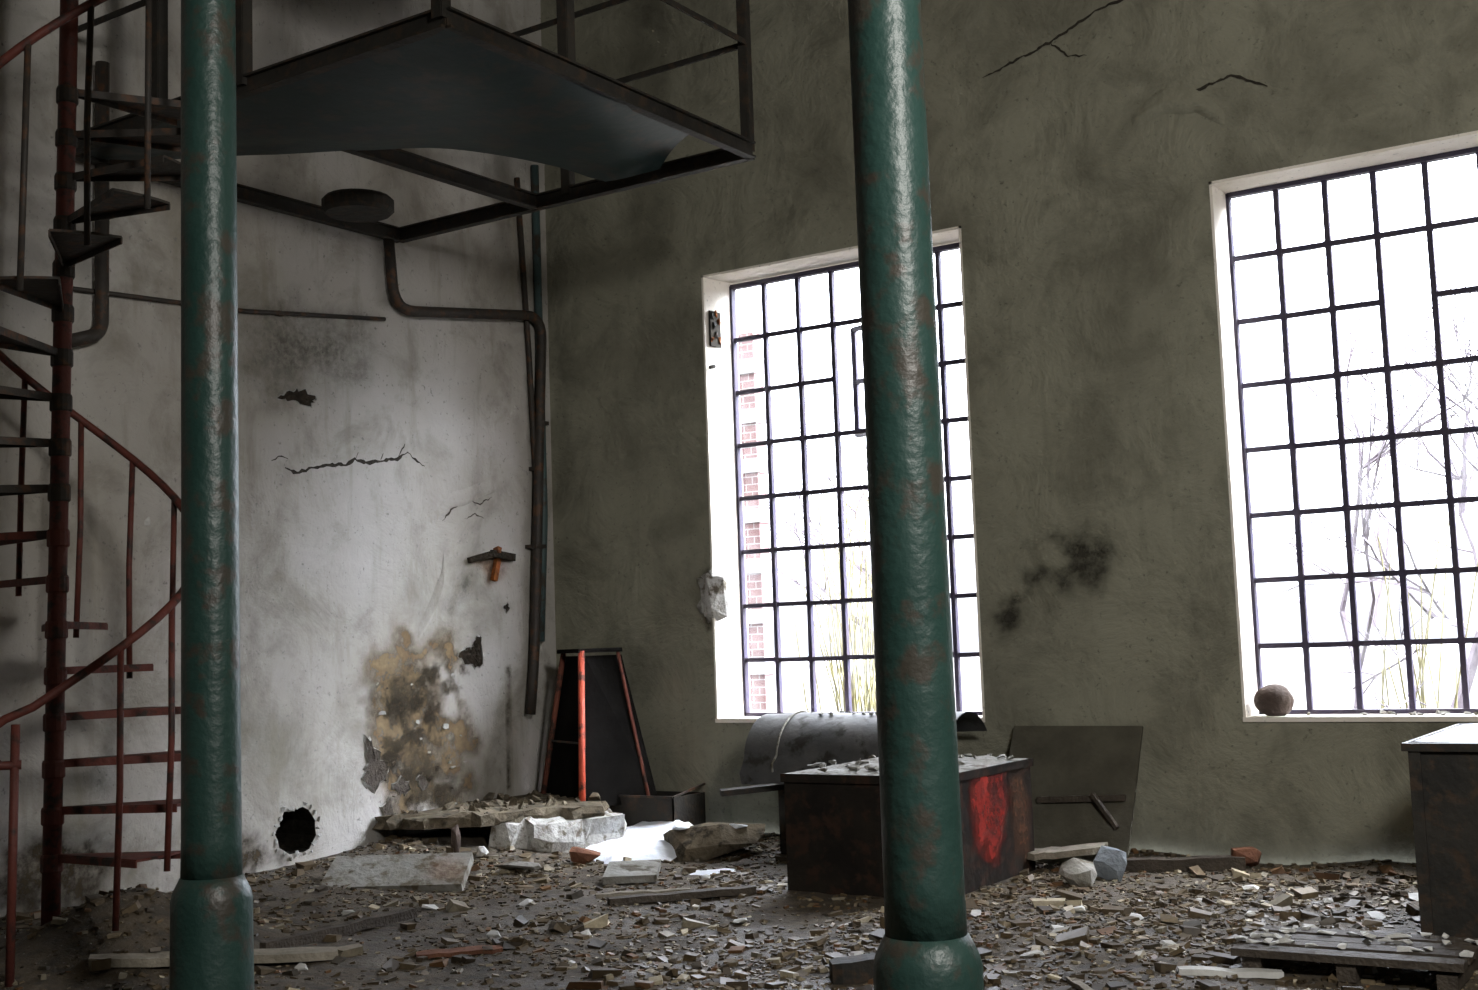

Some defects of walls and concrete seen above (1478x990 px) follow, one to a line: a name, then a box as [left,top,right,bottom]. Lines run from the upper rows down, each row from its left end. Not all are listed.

flaking render [276,387,317,408]
crack [271,444,424,474]
water stain [1060,540,1109,587]
flaking render [457,634,484,670]
spalling [272,802,322,861]